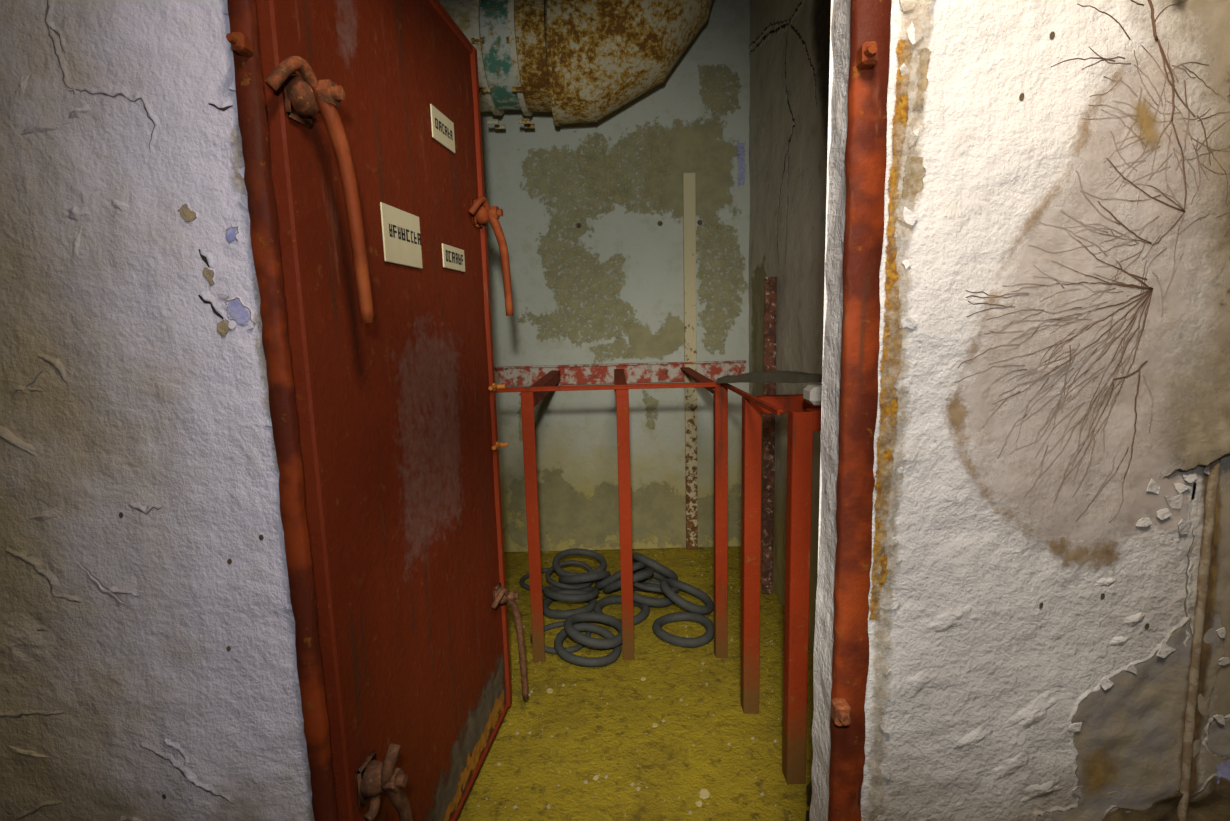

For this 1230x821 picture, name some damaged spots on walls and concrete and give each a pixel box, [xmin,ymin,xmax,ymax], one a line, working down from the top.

crack [44,0,160,153]
peeling [518,64,747,364]
damp [1169,0,1230,393]
corrosion [869,39,912,621]
damp [949,397,967,444]
damp [1051,543,1117,566]
peeling [1033,614,1230,821]